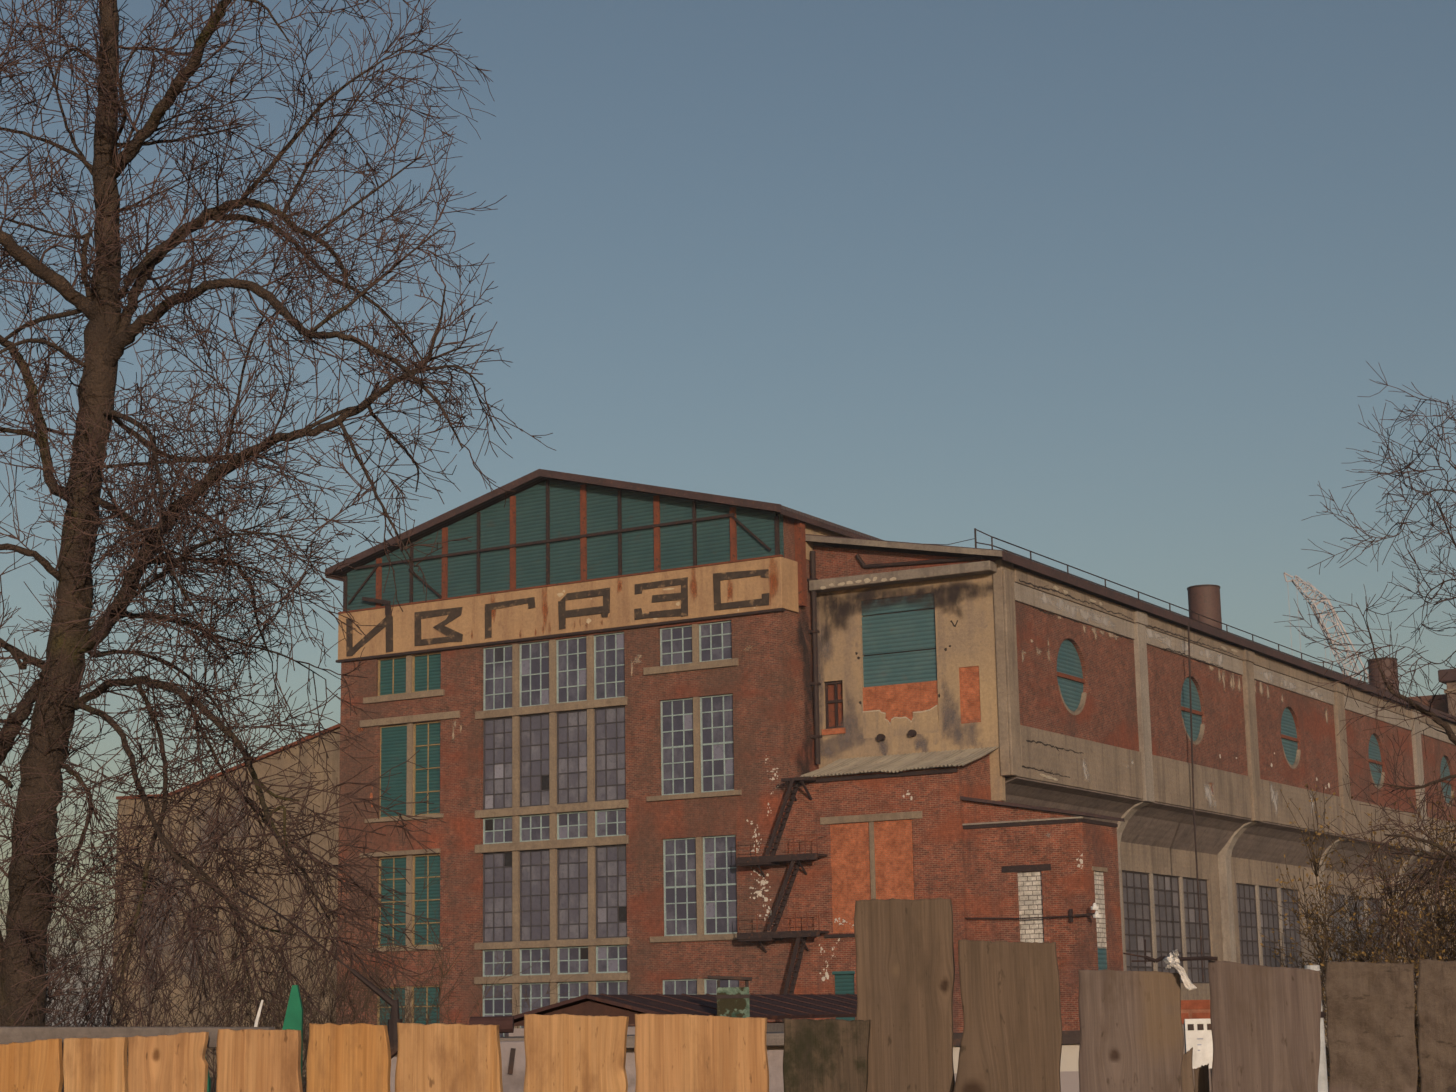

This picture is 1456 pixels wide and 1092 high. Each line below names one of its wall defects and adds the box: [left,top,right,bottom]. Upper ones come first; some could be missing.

spalling [859,695,940,739]